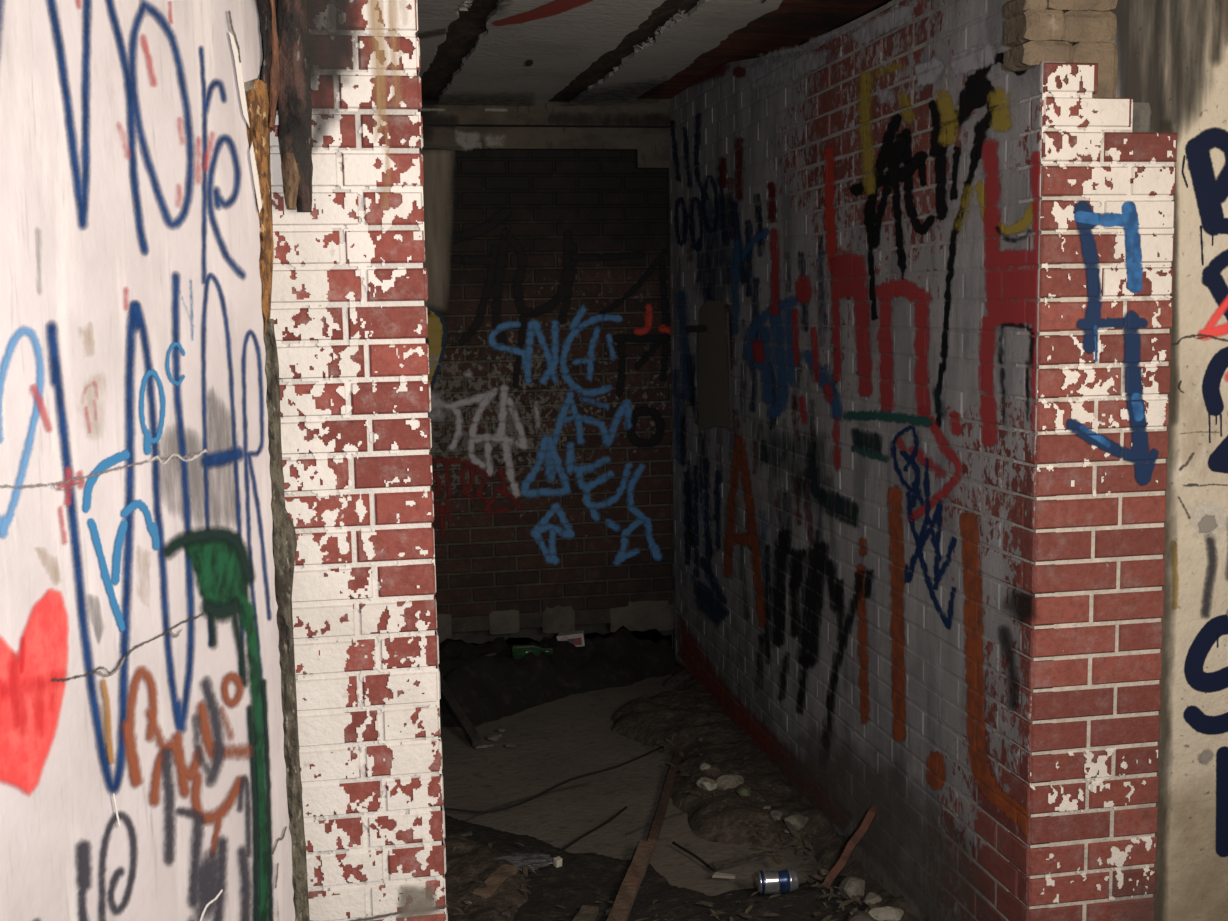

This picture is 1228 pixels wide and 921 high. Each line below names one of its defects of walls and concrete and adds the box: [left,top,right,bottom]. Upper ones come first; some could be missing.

peeling [228,11,263,127]
peeling [743,6,914,90]
peeling [915,0,1184,467]
peeling [250,0,446,921]
peeling [1030,748,1158,812]
peeling [1041,853,1061,903]
peeling [1070,836,1155,900]